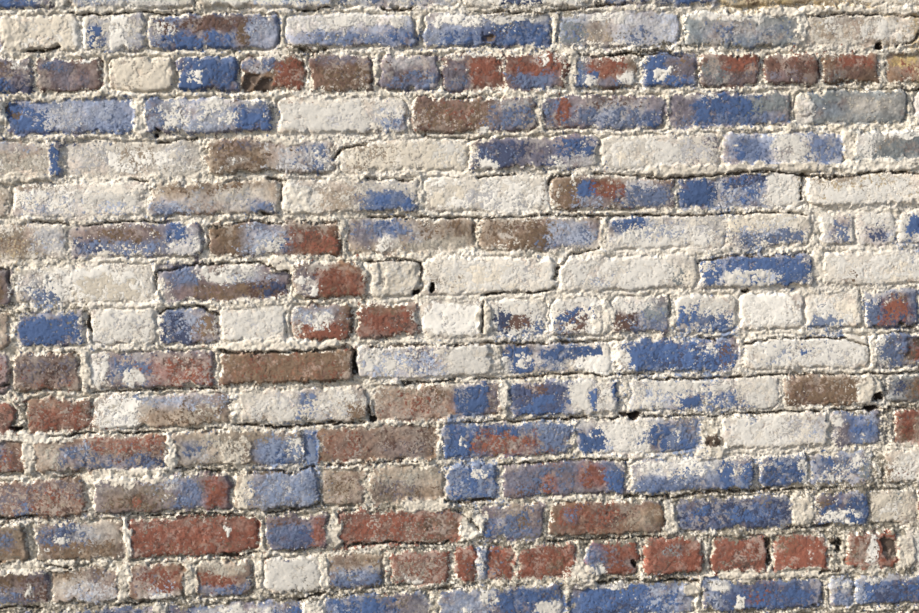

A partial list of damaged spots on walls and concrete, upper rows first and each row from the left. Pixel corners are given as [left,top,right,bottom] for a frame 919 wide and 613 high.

flaking render [234,47,304,103]
flaking render [310,47,374,102]
flaking render [386,28,568,143]
flaking render [550,10,643,129]
flaking render [88,217,162,251]
spalling [112,128,169,184]
flaking render [146,133,279,203]
spalling [306,136,407,215]
flaking render [418,170,631,252]
flaking render [0,224,896,613]